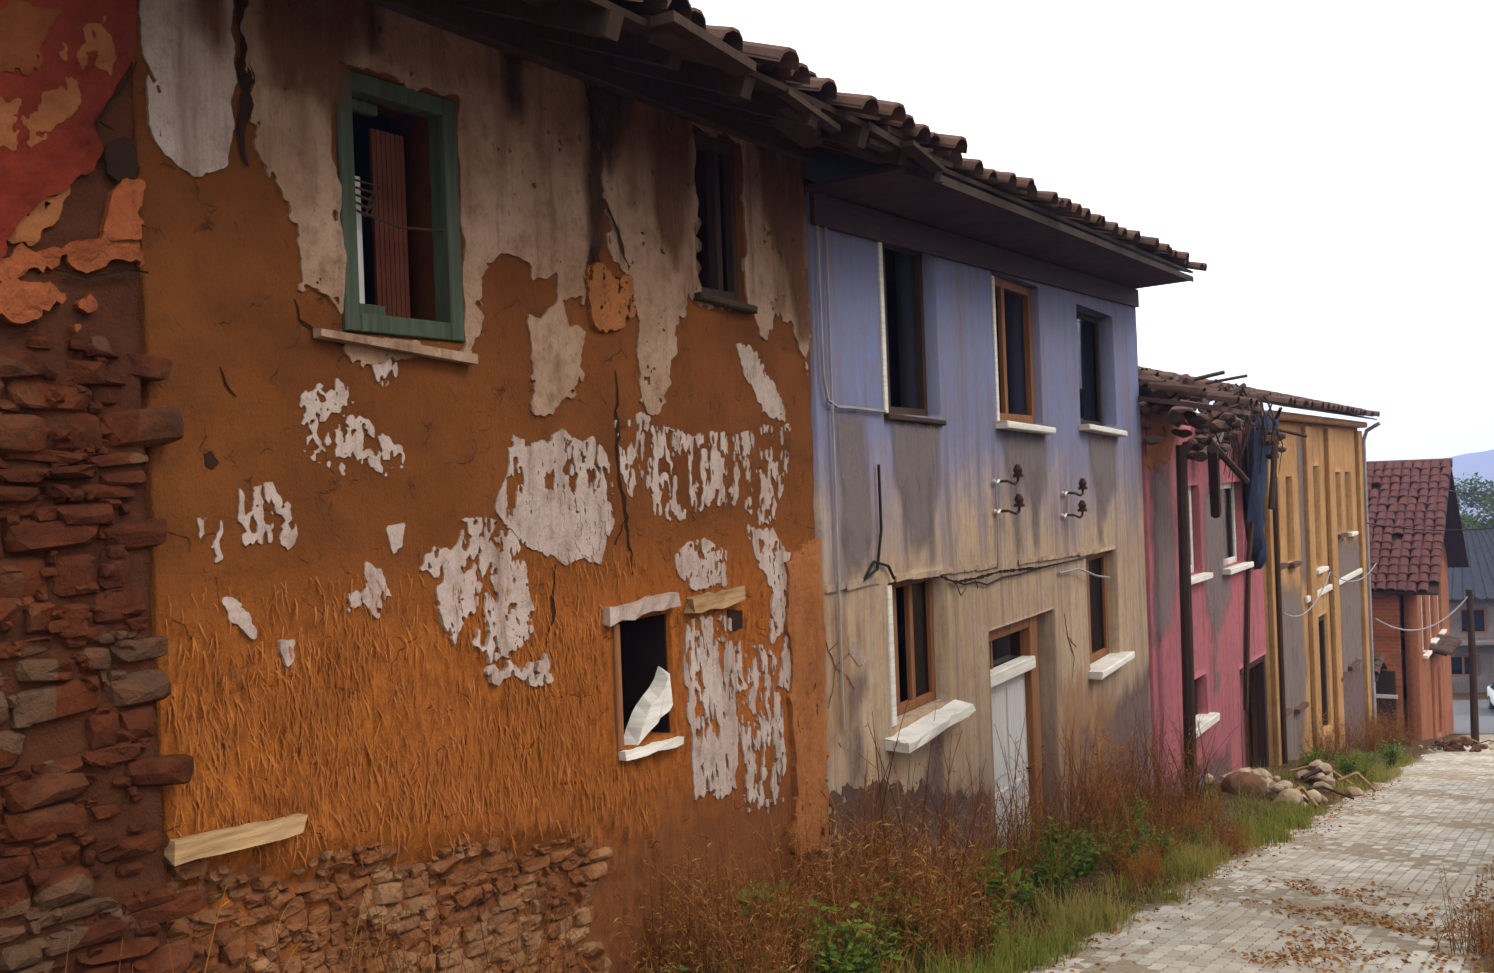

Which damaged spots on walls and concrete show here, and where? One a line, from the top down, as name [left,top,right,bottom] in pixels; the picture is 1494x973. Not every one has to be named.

peeling [0,0,347,334]
crack [236,0,255,167]
peeling [196,482,298,563]
peeling [299,378,405,476]
peeling [342,0,989,902]